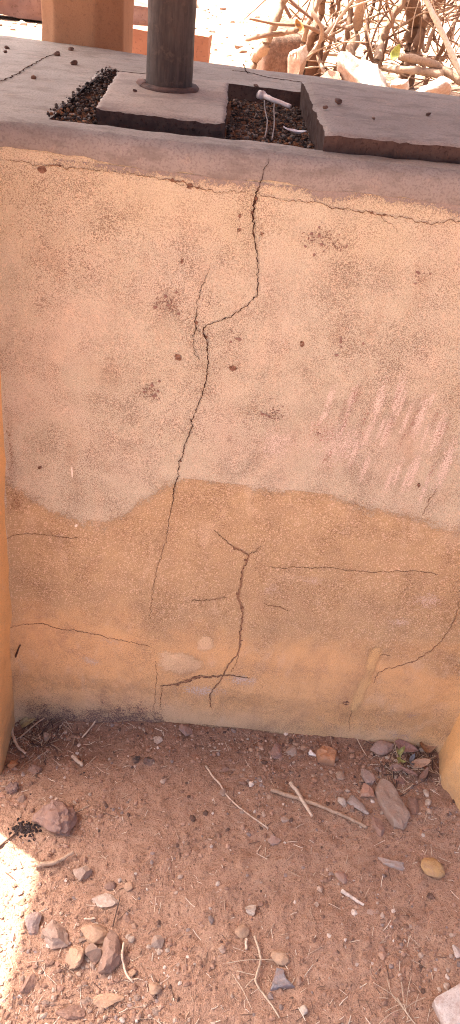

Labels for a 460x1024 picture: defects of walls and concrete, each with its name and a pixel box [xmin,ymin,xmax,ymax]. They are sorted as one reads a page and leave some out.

crack [0,55,52,81]
crack [10,160,460,618]
crack [11,530,436,712]
water stain [4,368,460,740]
crack [348,609,458,724]